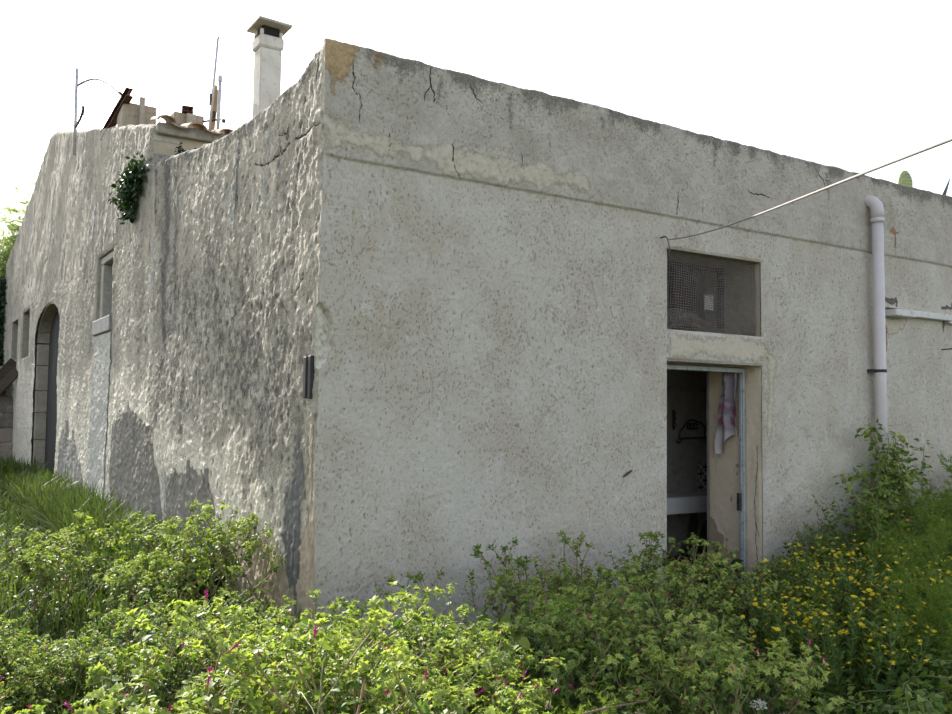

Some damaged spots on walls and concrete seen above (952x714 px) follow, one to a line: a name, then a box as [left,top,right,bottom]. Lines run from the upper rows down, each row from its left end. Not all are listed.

crack [352,62,363,121]
crack [424,68,435,102]
crack [255,123,321,167]
leakage [109,113,314,627]
leakage [57,420,83,490]